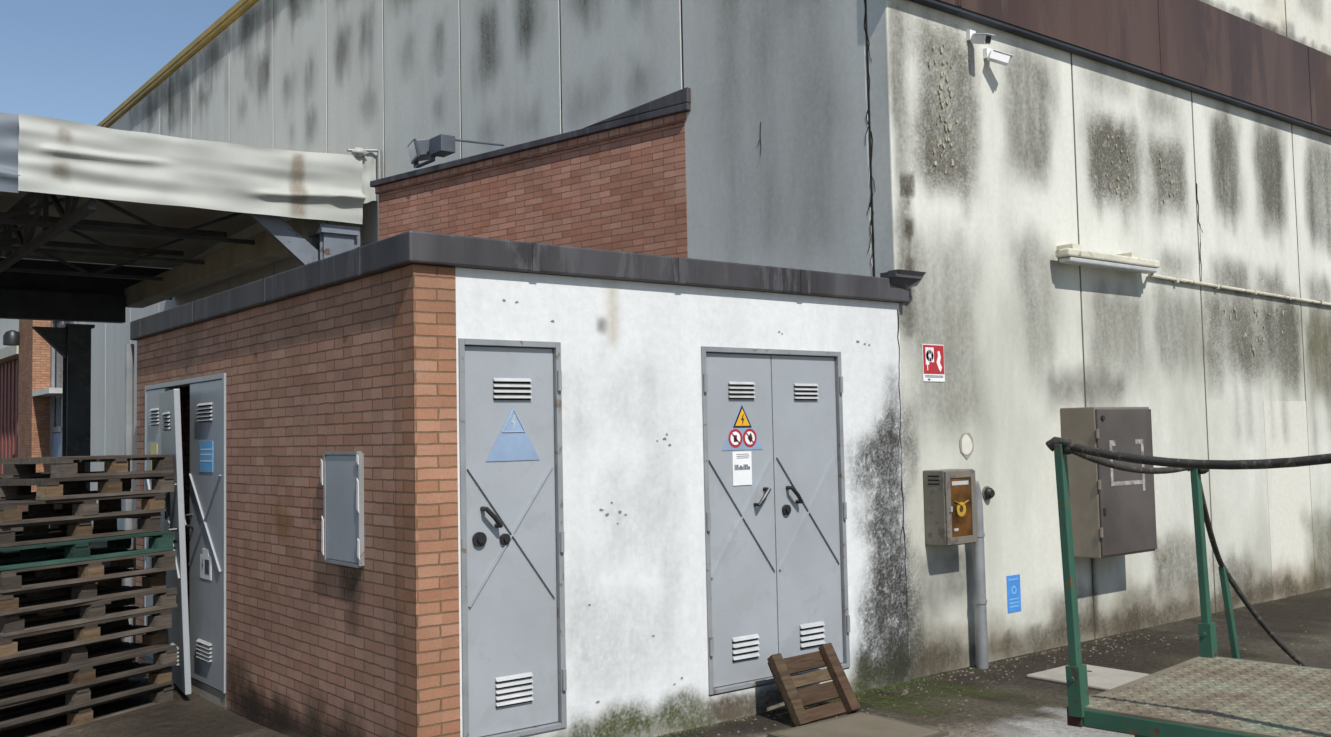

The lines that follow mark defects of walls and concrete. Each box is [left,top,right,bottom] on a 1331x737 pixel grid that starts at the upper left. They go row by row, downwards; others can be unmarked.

crack [864,0,876,276]
leakage [917,24,976,185]
leakage [1013,65,1047,168]
leakage [1088,119,1186,204]
leakage [1213,115,1238,208]
leakage [1257,129,1283,219]
leakage [1208,298,1331,386]
crack [897,309,909,663]
leakage [856,413,973,707]
leakage [992,606,1200,692]
leakage [672,690,791,737]